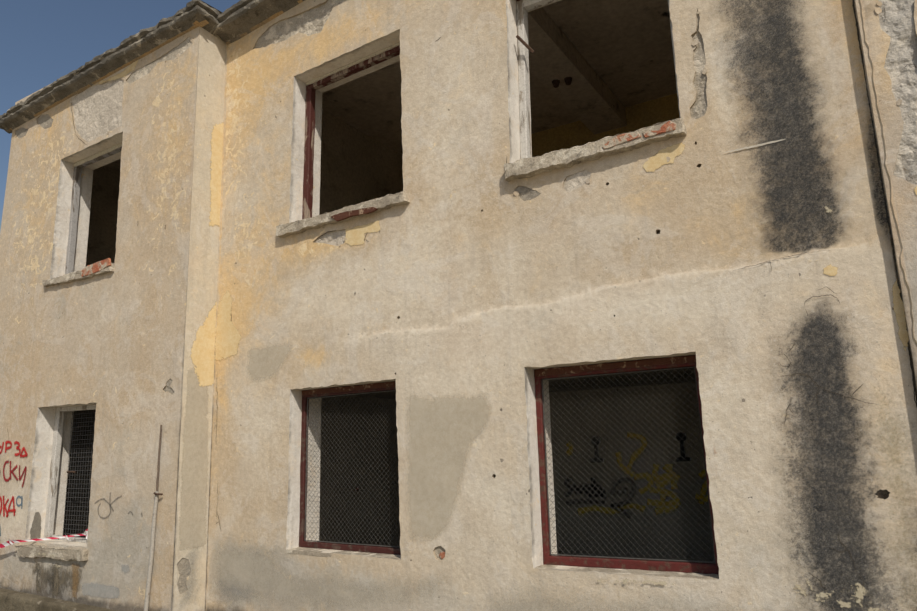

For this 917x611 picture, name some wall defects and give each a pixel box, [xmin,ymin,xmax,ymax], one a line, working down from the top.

spalling [70,37,193,142]
spalling [253,0,345,49]
flaking render [602,121,677,149]
peeling [643,142,685,172]
spalling [690,8,707,119]
leakage [723,0,843,252]
crack [852,0,902,300]
spalling [875,0,917,195]
peeling [314,220,380,246]
peeling [191,301,217,386]
crack [906,328,917,407]
leakage [782,305,898,611]